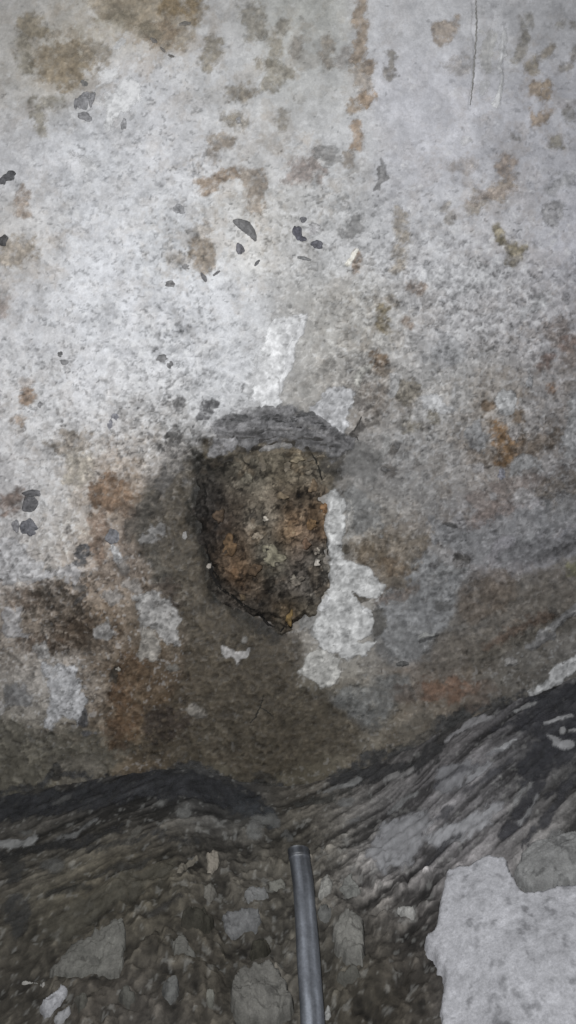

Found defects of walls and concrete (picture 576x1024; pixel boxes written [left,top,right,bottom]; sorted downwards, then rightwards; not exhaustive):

crack [470,0,478,105]
peeling [420,394,455,414]
corrosion [469,400,564,467]
peeling [0,489,90,605]
peeling [93,313,400,688]
leakage [0,439,576,940]